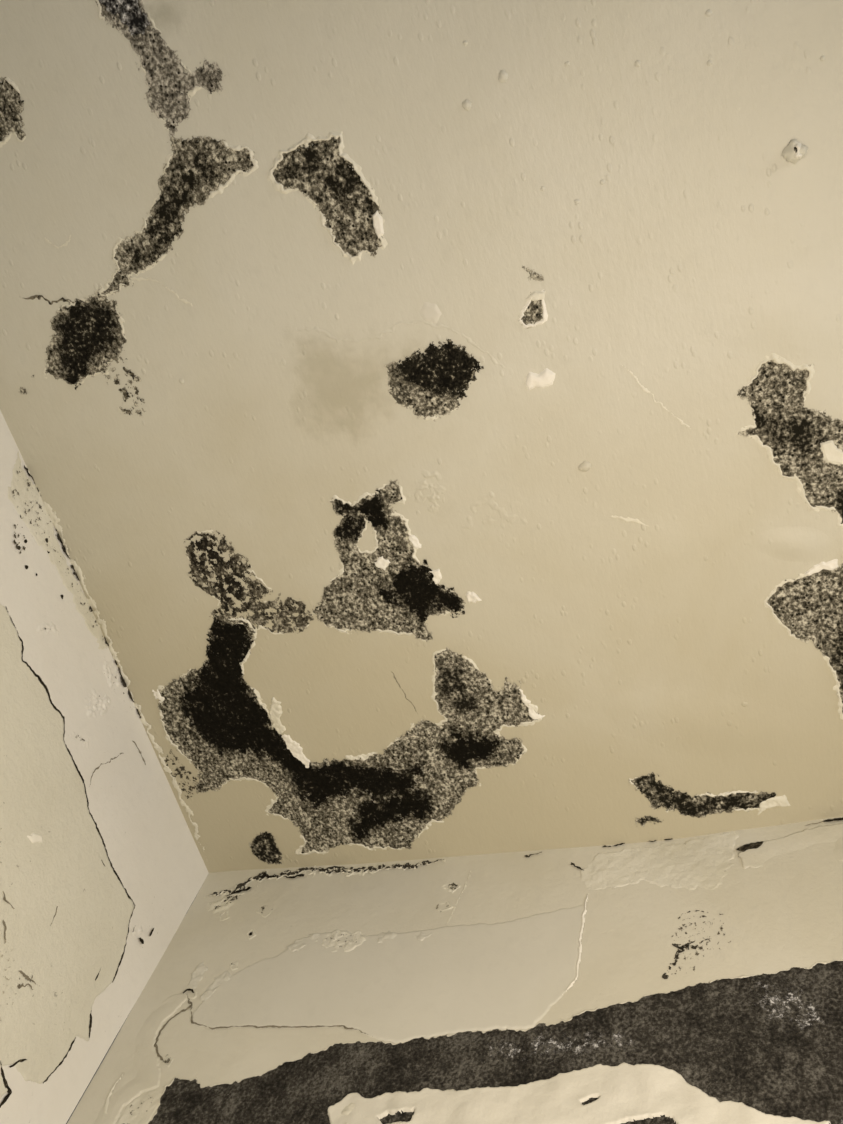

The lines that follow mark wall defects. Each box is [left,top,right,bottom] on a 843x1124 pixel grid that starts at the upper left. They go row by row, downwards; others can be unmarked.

peeling [0,77,26,148]
peeling [19,0,388,417]
peeling [384,339,484,421]
peeling [736,353,843,527]
peeling [152,479,545,855]
peeling [764,559,843,720]
peeling [629,772,791,827]
spalling [116,818,843,1124]